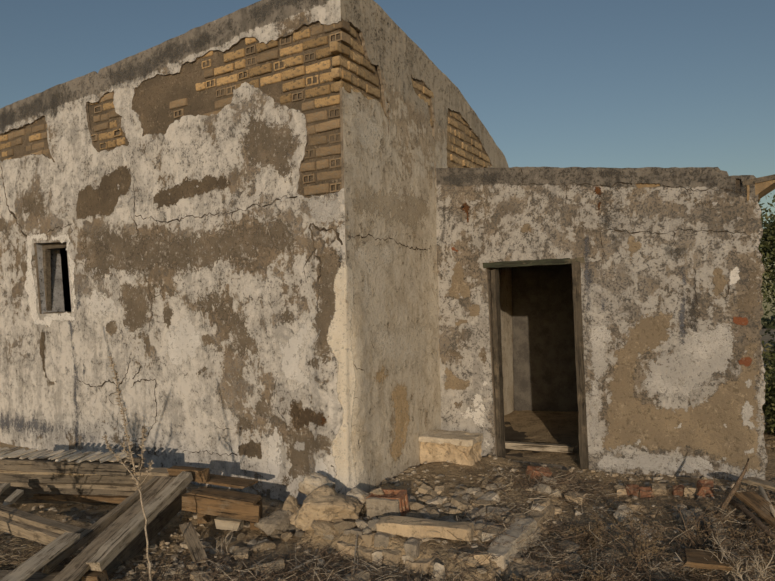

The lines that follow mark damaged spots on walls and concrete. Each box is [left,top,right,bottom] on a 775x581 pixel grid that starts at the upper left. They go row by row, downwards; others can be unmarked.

flaking render [0,116,55,162]
flaking render [89,92,129,152]
flaking render [133,19,385,198]
flaking render [412,79,434,128]
flaking render [447,110,491,168]
crack [126,170,297,316]
crack [303,223,430,340]